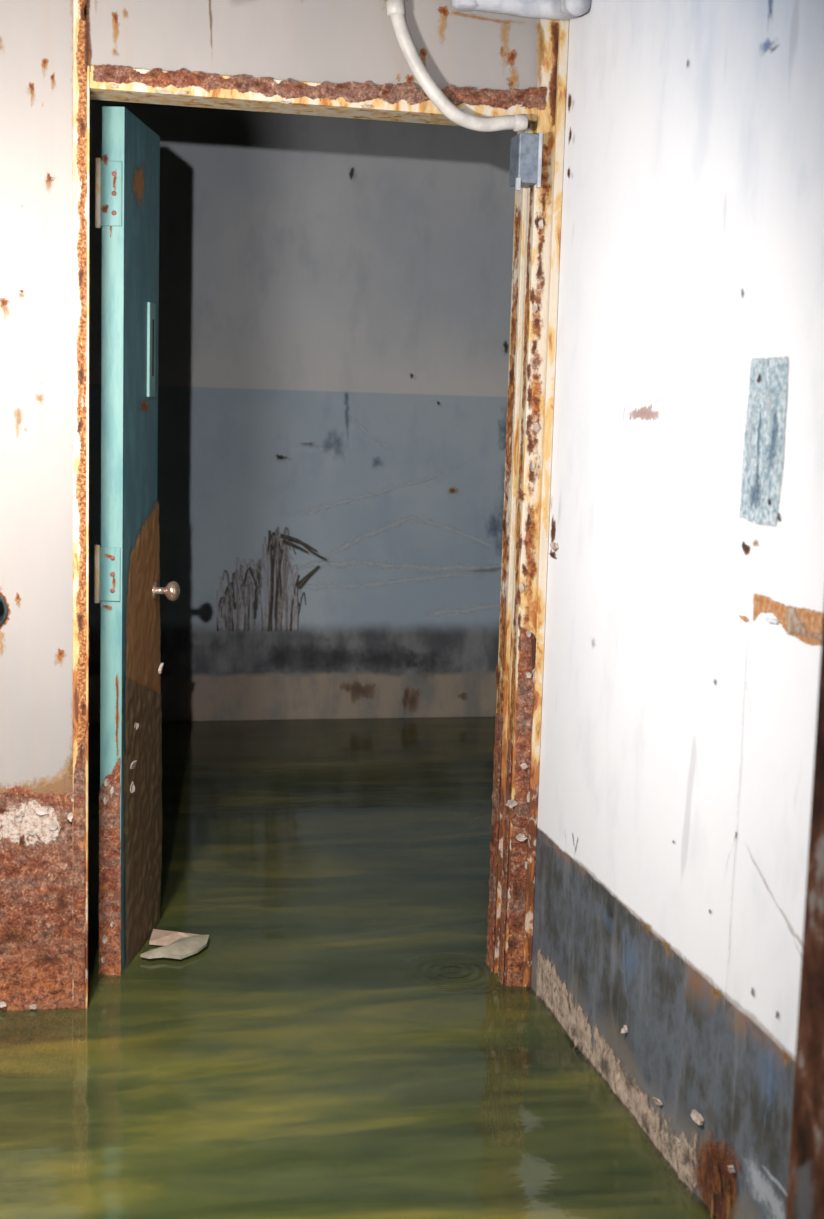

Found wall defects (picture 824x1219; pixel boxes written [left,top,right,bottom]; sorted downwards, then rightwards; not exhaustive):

rust [0,0,559,1079]
peeling [739,594,823,645]
rust [693,1131,740,1219]
leakage [751,1163,787,1219]